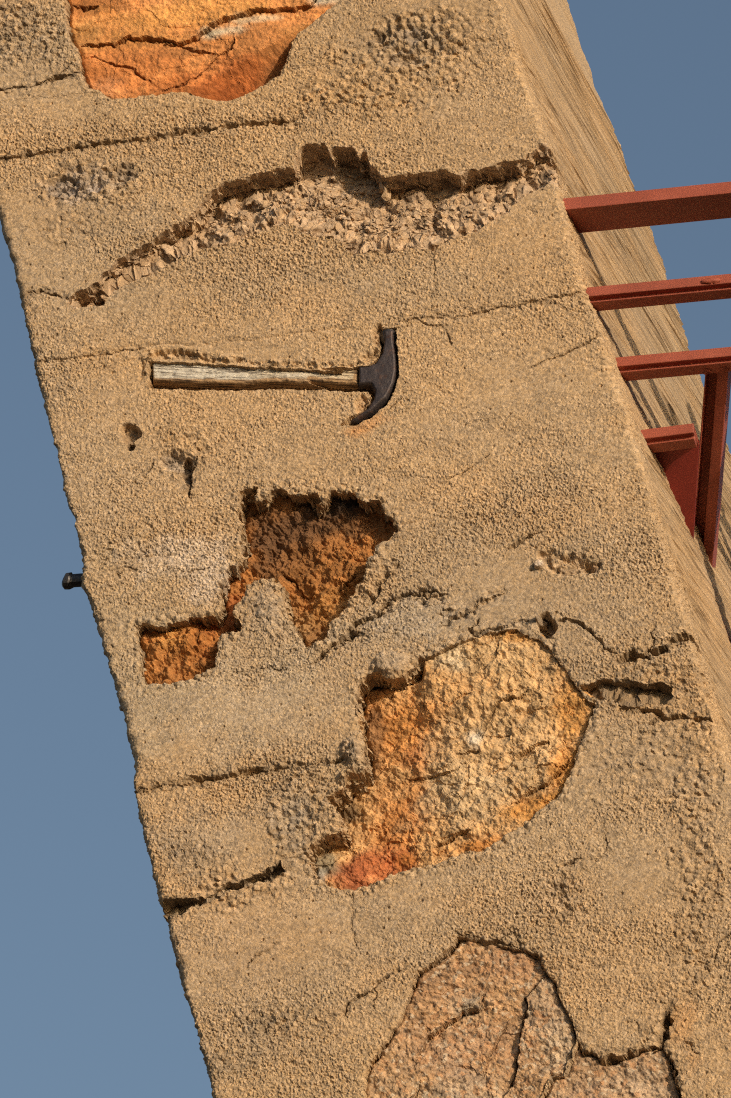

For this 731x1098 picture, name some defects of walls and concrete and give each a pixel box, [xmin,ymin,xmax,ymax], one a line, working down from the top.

spalling [65,141,560,311]
crack [647,711,718,726]